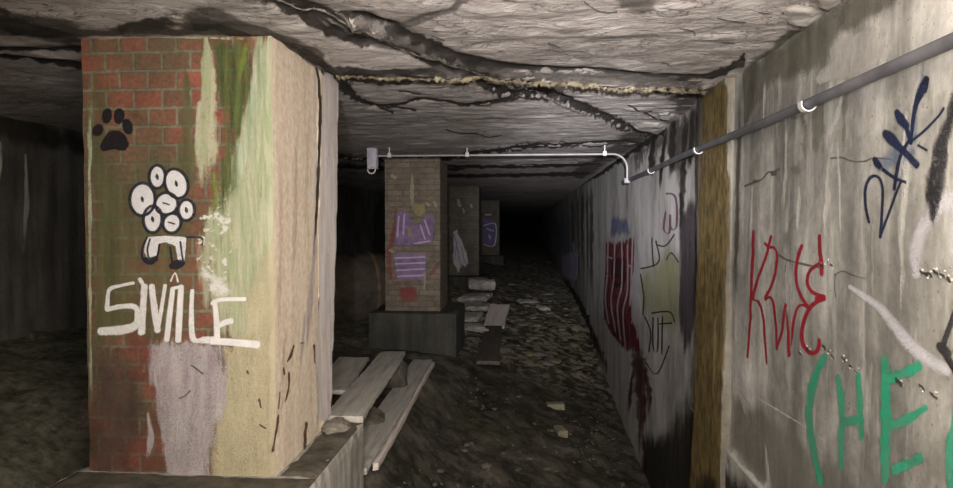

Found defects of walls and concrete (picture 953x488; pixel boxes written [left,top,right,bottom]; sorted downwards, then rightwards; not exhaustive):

peeling [192,36,339,477]
crack [241,0,769,254]
crack [744,167,780,187]
water stain [726,0,898,318]
water stain [897,64,921,308]
water stain [640,382,852,488]